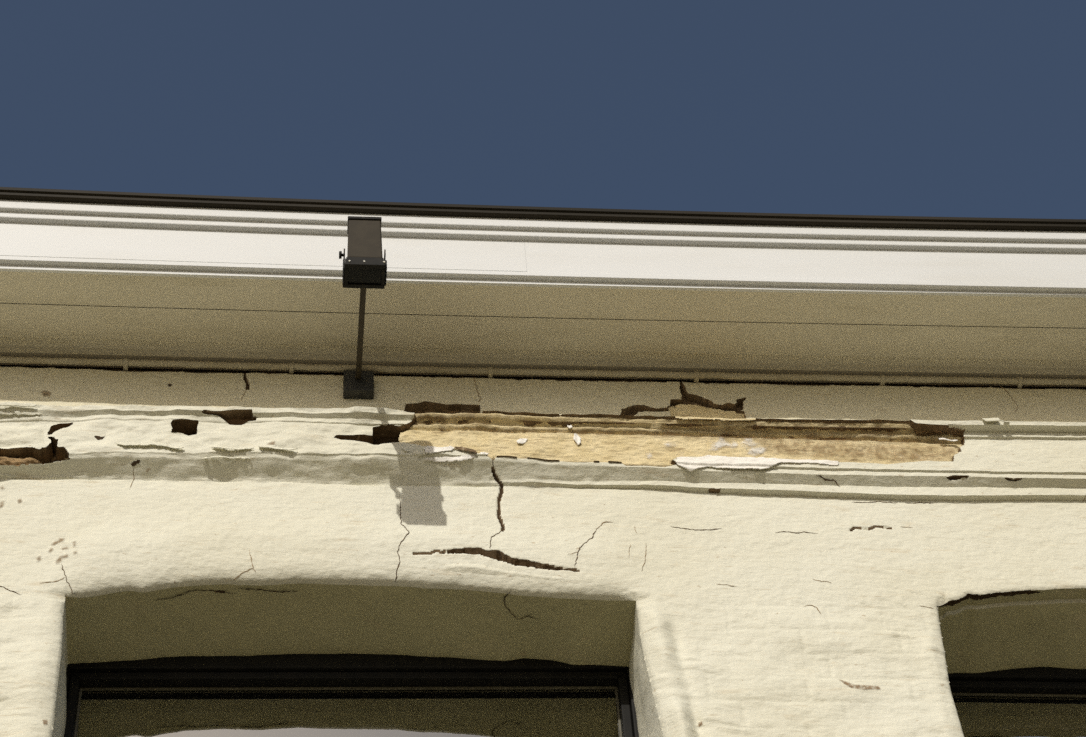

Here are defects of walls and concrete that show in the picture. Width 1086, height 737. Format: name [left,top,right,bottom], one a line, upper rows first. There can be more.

spalling [0,457,56,466]
crack [156,551,300,601]
crack [395,498,409,582]
crack [489,456,504,548]
spalling [373,389,963,472]
crack [925,590,1040,608]